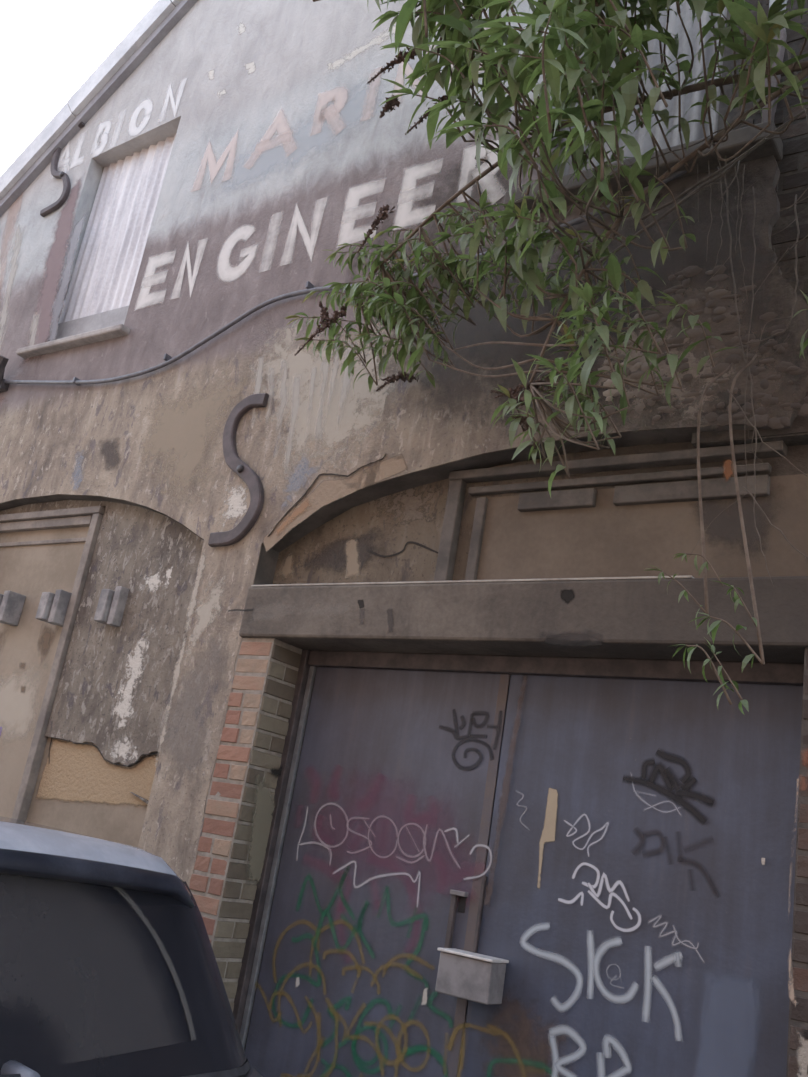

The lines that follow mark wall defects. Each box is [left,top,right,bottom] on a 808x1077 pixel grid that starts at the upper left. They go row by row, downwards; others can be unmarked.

peeling [222,486,247,526]
peeling [140,567,173,592]
peeling [188,578,223,655]
spalling [36,627,160,806]
spalling [789,950,797,1004]
spalling [797,1029,808,1077]